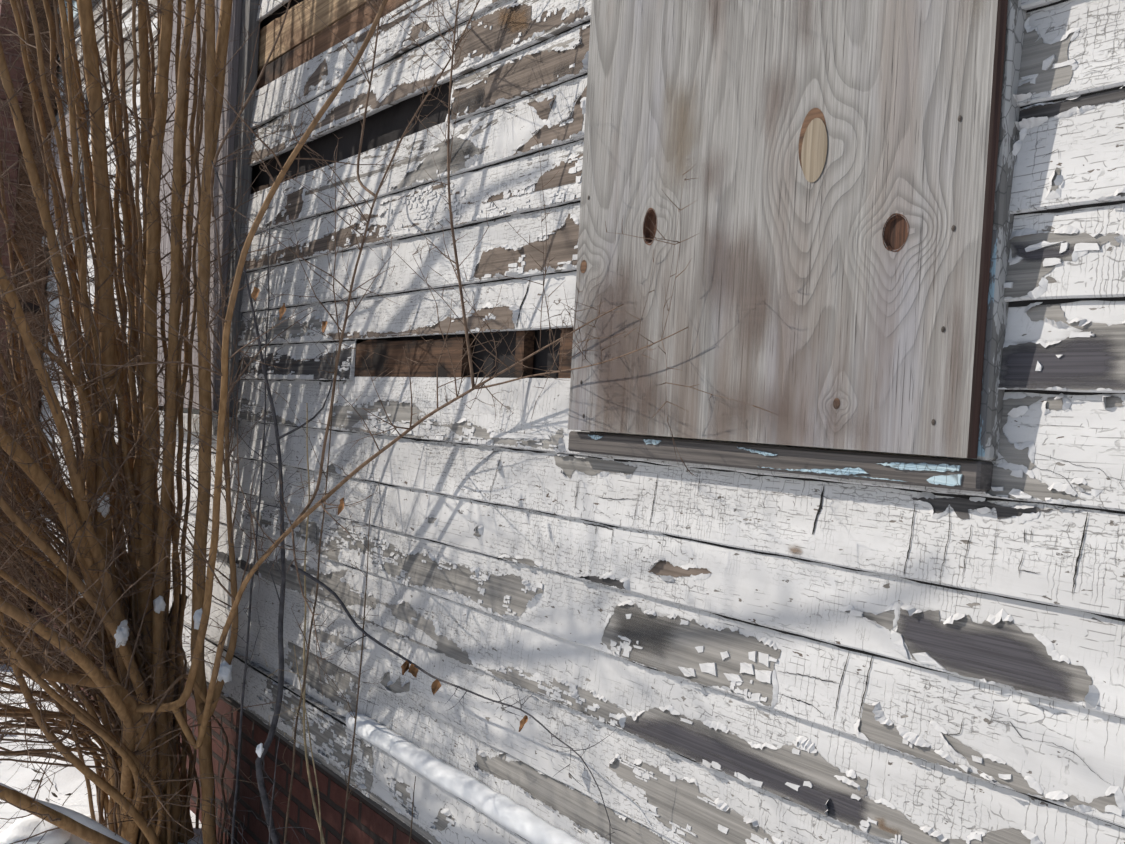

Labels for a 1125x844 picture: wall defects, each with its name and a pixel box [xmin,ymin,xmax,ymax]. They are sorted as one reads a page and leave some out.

peeling [1012,13,1125,156]
peeling [244,0,590,280]
peeling [237,302,520,380]
peeling [737,225,1125,523]
crack [575,475,658,543]
crack [812,486,824,534]
crack [904,506,915,573]
crack [940,506,1045,576]
crack [1035,453,1125,489]
crack [1072,512,1088,593]
peeling [216,507,1042,844]
peeling [837,602,1099,708]